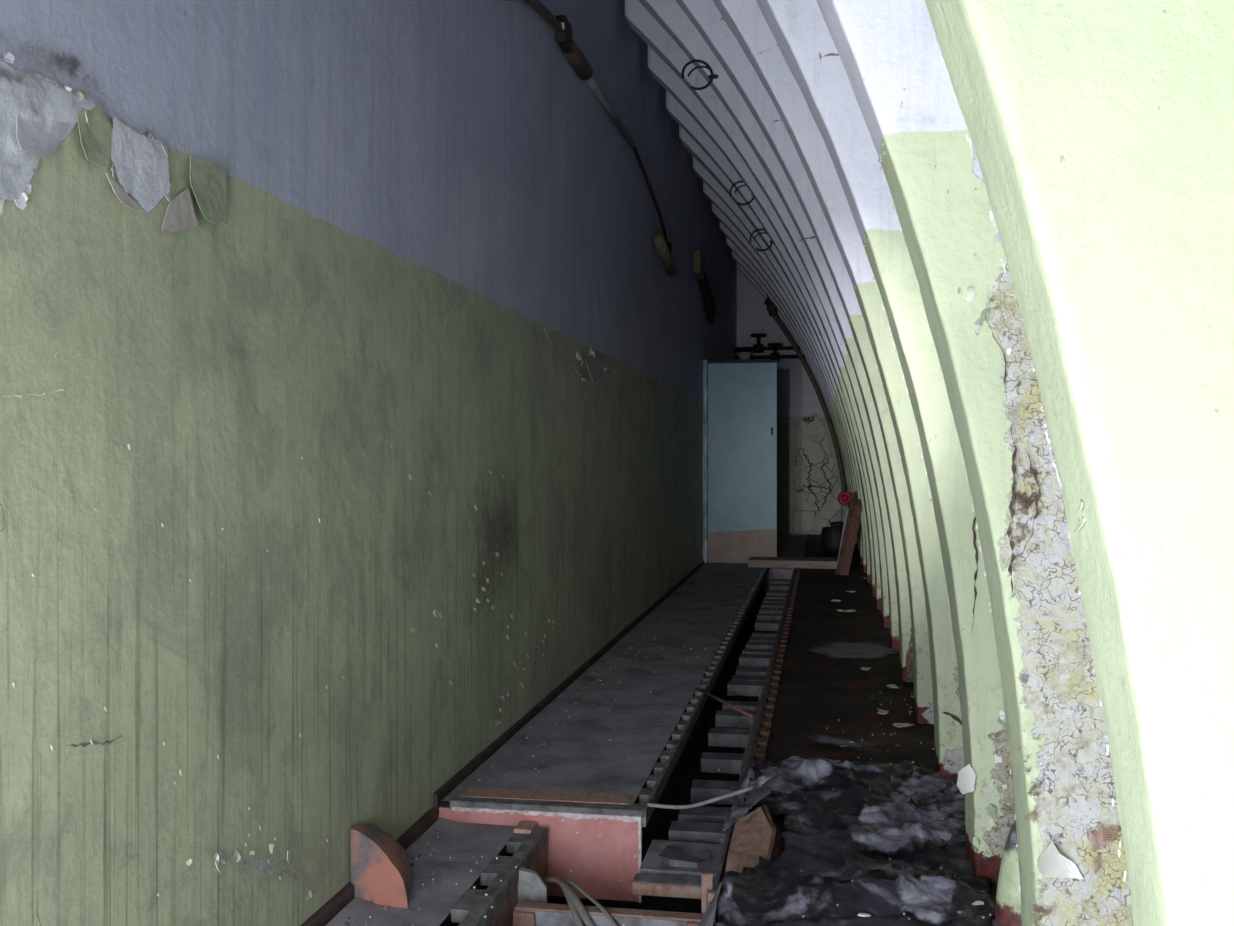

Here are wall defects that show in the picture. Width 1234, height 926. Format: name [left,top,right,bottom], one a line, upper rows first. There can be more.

peeling [0,47,228,232]
peeling [965,134,984,181]
crack [971,516,979,627]
spalling [943,211,1133,926]